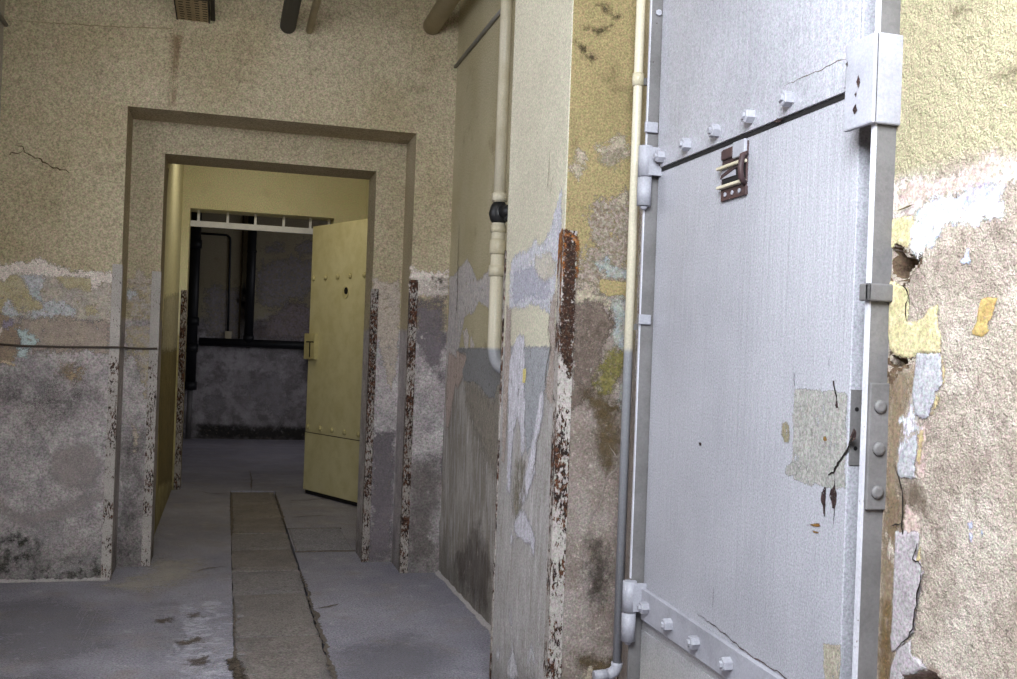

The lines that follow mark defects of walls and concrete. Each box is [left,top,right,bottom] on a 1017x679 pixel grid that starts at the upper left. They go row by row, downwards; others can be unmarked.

crack [9,146,69,173]
peeling [0,256,112,367]
peeling [369,189,563,473]
rust [557,228,580,373]
peeling [887,150,1017,481]
crack [891,467,921,649]
peeling [889,505,957,679]